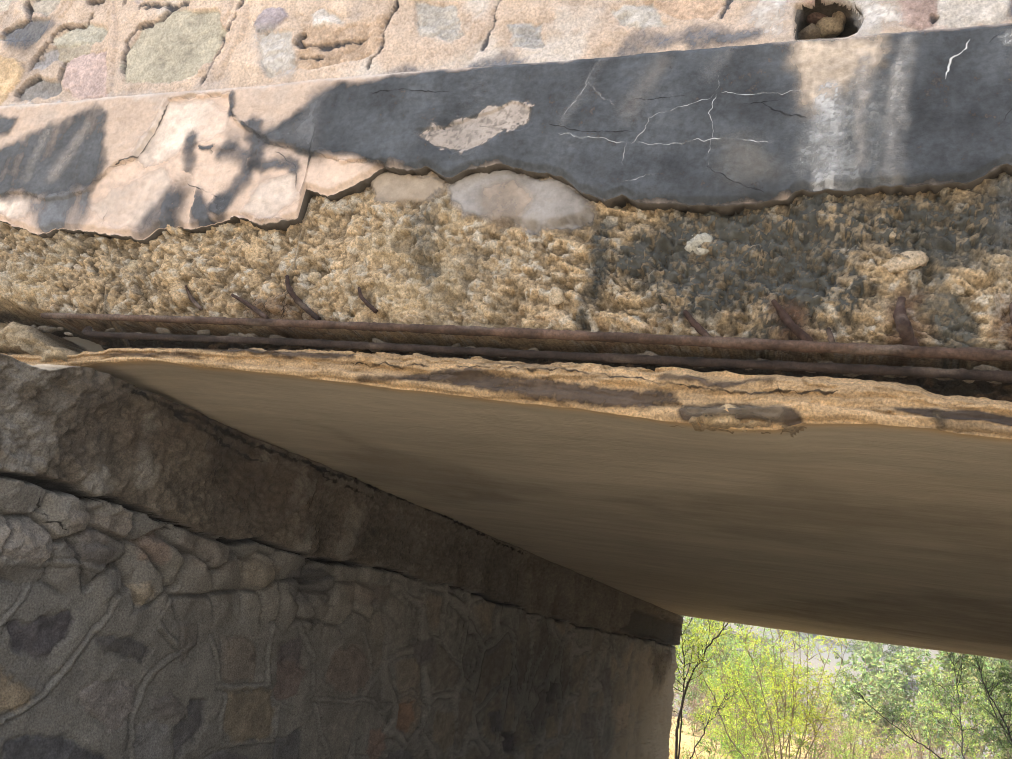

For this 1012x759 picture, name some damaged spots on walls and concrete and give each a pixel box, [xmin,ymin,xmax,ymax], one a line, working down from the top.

crack [945,34,999,79]
crack [115,105,168,165]
crack [229,94,297,190]
crack [550,75,807,192]
spalling [0,92,1012,402]
corrosion [107,347,355,359]
crack [36,498,67,530]